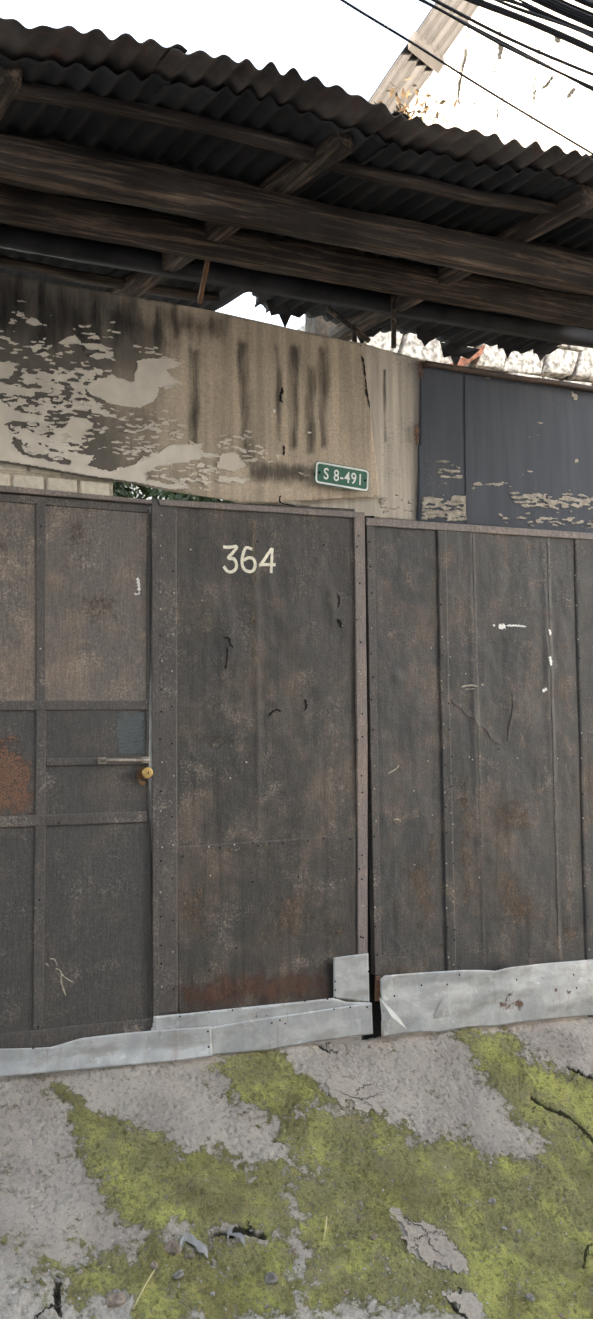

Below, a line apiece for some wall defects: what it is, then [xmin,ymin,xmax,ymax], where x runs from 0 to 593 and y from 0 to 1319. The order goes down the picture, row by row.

peeling [0,300,282,492]
peeling [380,460,593,528]
corrosion [0,735,35,815]